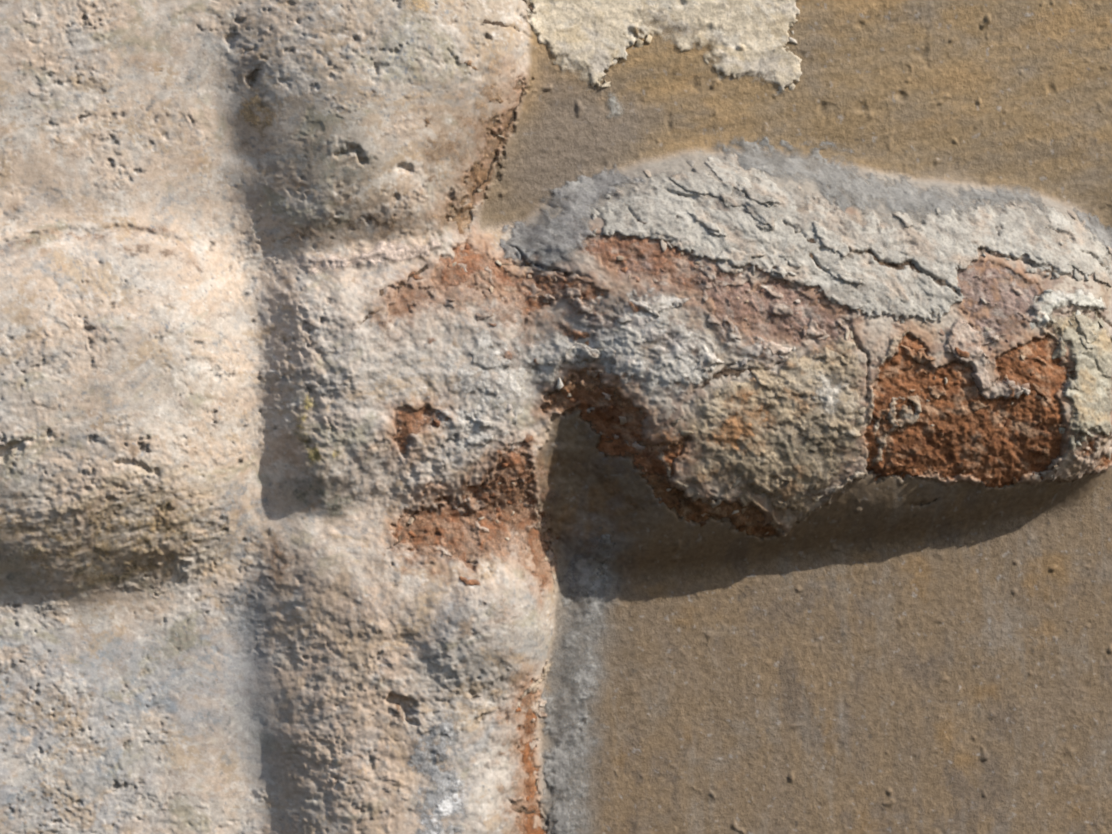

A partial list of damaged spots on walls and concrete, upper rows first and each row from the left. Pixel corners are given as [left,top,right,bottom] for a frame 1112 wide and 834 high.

flaking render [527,0,802,115]
crack [471,92,523,209]
spalling [393,271,428,314]
crack [785,224,824,271]
crack [856,249,957,293]
crack [978,248,1059,275]
flaking render [437,153,1112,538]
spalling [393,396,449,452]
spalling [394,417,559,592]